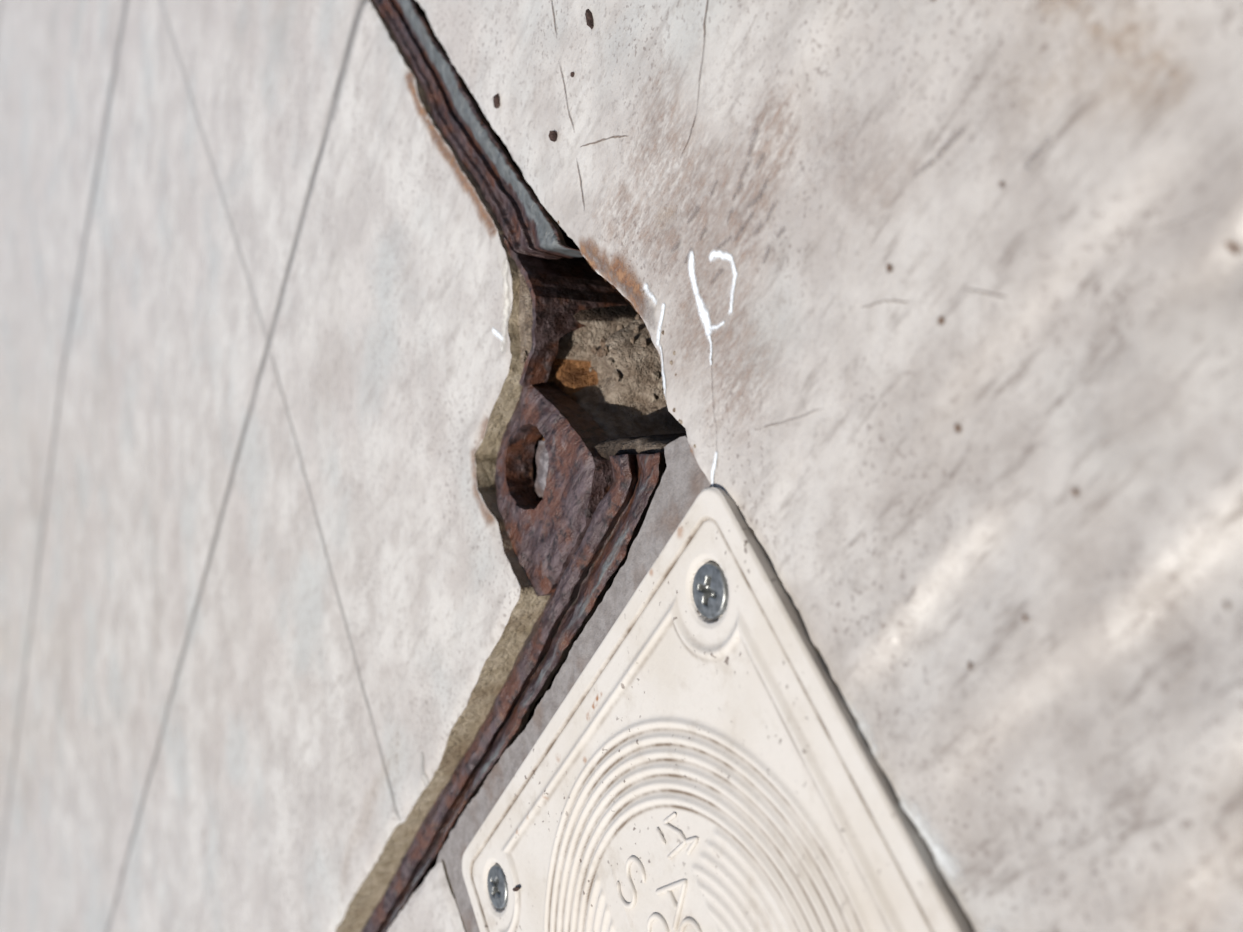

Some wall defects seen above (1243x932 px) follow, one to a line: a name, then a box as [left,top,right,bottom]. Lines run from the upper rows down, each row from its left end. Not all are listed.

rust [406,73,495,234]
crack [680,0,708,158]
spalling [492,259,532,352]
rust [580,242,644,314]
spalling [550,220,687,457]